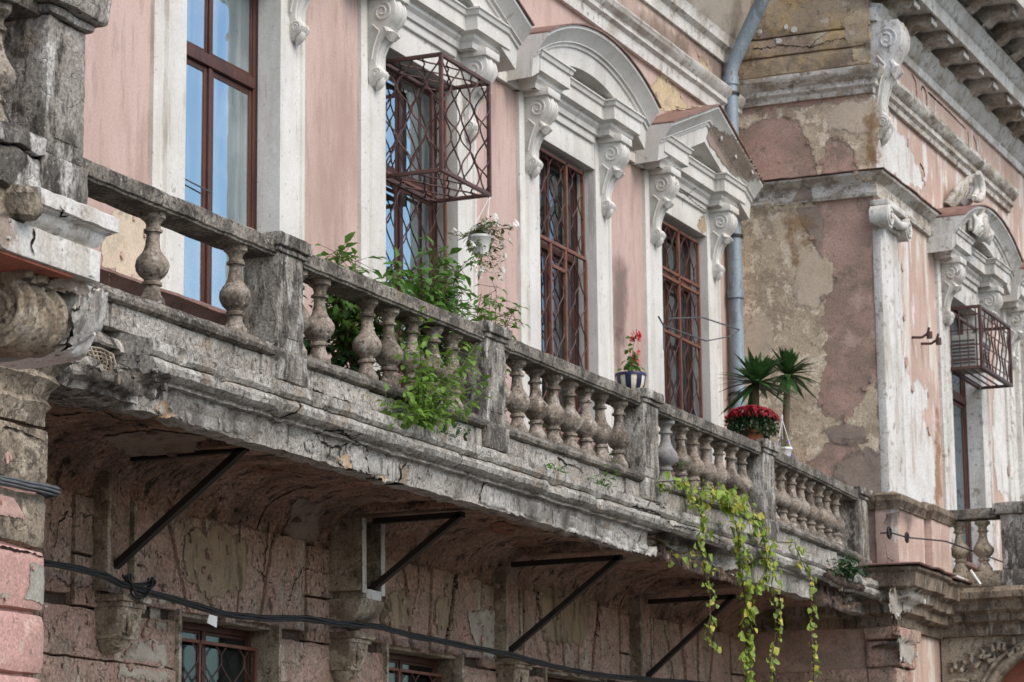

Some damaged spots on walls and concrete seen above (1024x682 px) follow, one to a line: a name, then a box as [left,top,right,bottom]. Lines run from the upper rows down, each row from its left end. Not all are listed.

crack [753,32,845,50]
flaking render [650,74,708,112]
peeling [707,94,926,190]
crack [32,380,158,430]
flaking render [40,273,247,458]
peeling [741,201,880,463]
peeling [902,354,936,505]
peeling [881,585,927,620]